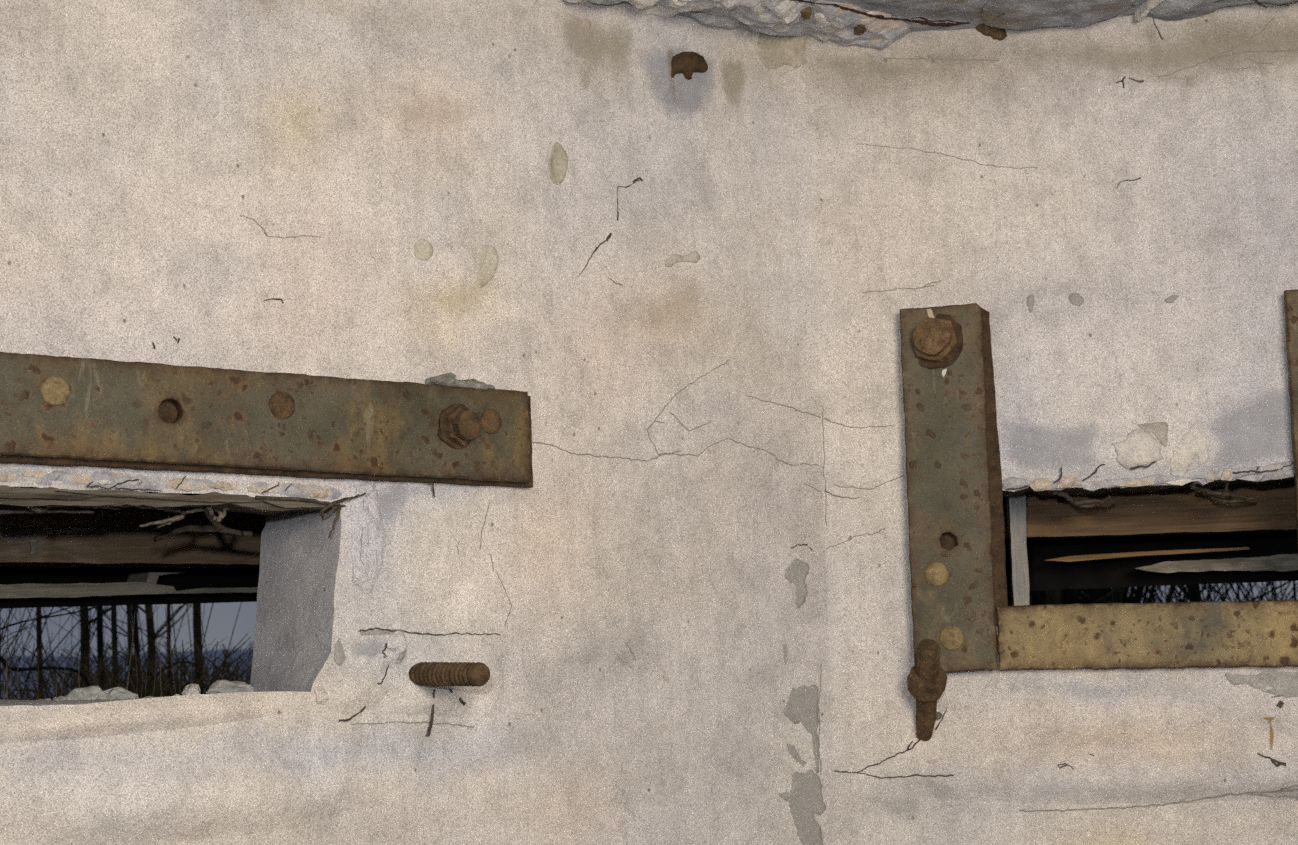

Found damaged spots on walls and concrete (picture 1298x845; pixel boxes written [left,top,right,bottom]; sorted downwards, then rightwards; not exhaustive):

spalling [565,0,910,69]
peeling [975,0,1298,41]
crack [532,359,904,551]
spalling [1003,422,1294,492]
peeling [785,558,810,608]
crack [818,663,954,779]
spalling [1225,670,1298,708]
peeling [779,684,826,845]